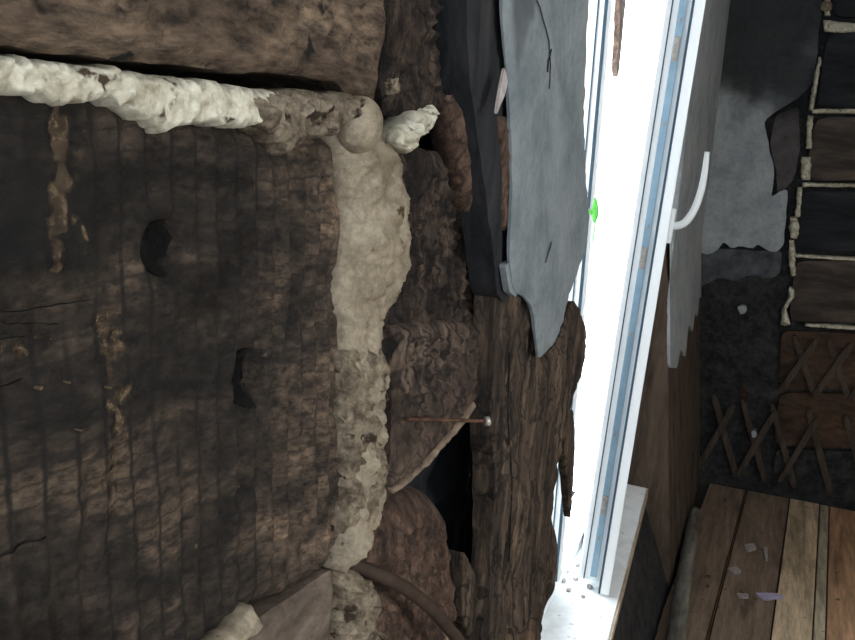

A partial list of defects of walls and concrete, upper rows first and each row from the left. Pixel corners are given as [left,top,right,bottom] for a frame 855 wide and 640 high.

flaking render [494,0,589,357]
flaking render [667,0,800,368]
crack [0,536,46,557]